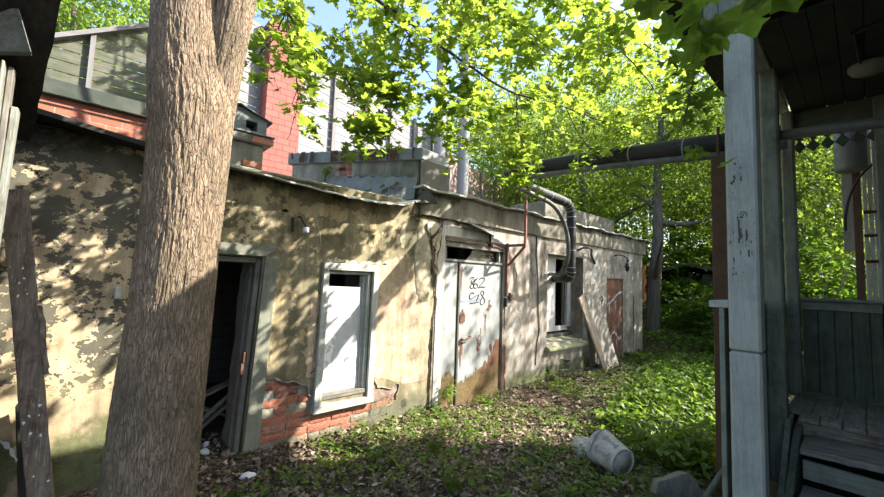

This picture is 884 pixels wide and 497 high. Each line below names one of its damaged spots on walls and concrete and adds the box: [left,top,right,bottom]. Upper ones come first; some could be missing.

peeling [0,141,145,455]
peeling [221,178,433,450]
crack [422,215,470,409]
corrosion [440,300,506,408]
peeling [2,472,18,497]